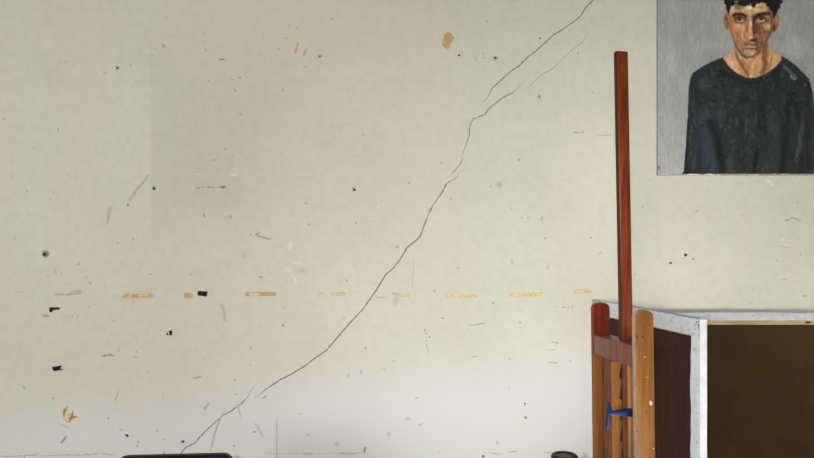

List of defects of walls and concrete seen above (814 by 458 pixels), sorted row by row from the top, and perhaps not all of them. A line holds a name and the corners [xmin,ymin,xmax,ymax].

crack [264,449,362,457]
crack [180,0,594,454]